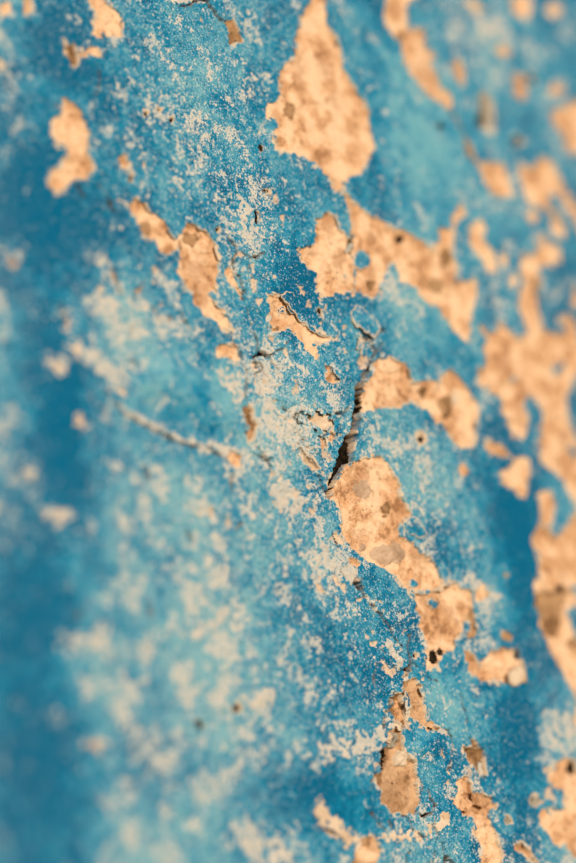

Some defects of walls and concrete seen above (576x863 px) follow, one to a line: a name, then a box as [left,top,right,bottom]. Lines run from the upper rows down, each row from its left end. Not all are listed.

peeling [0,1,11,16]
peeling [63,0,126,68]
peeling [49,97,92,196]
peeling [115,200,229,329]
crack [224,268,241,299]
peeling [265,0,576,693]
crack [324,305,381,499]
crack [381,638,407,671]
peeling [372,676,447,817]
spalling [463,740,484,779]
peeling [453,777,503,863]
peeling [529,759,576,858]